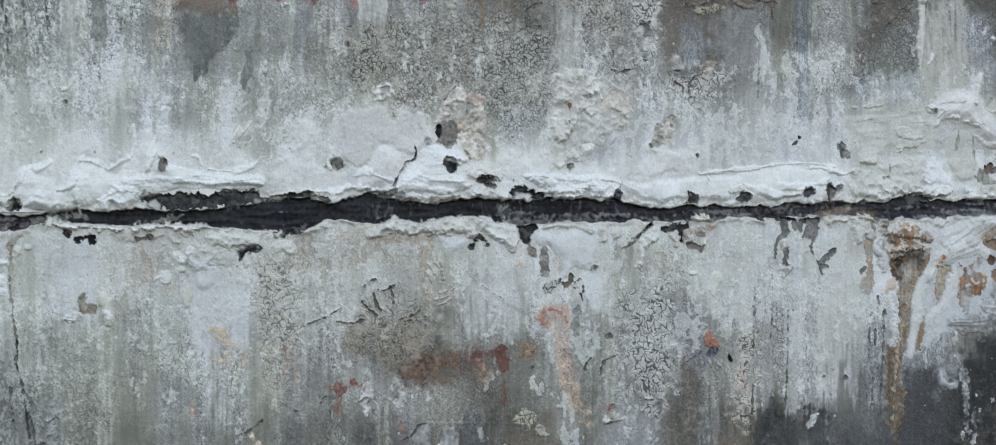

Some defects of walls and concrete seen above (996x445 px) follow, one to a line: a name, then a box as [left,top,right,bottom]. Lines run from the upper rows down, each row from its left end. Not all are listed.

water stain [175,12,239,81]
peeling [661,0,778,33]
spalling [425,85,488,161]
spalling [774,217,836,278]
rust [391,341,539,407]
crack [0,146,996,445]
rust [534,303,595,429]
water stain [752,396,833,445]
rust [860,213,996,443]
water stain [943,360,996,445]